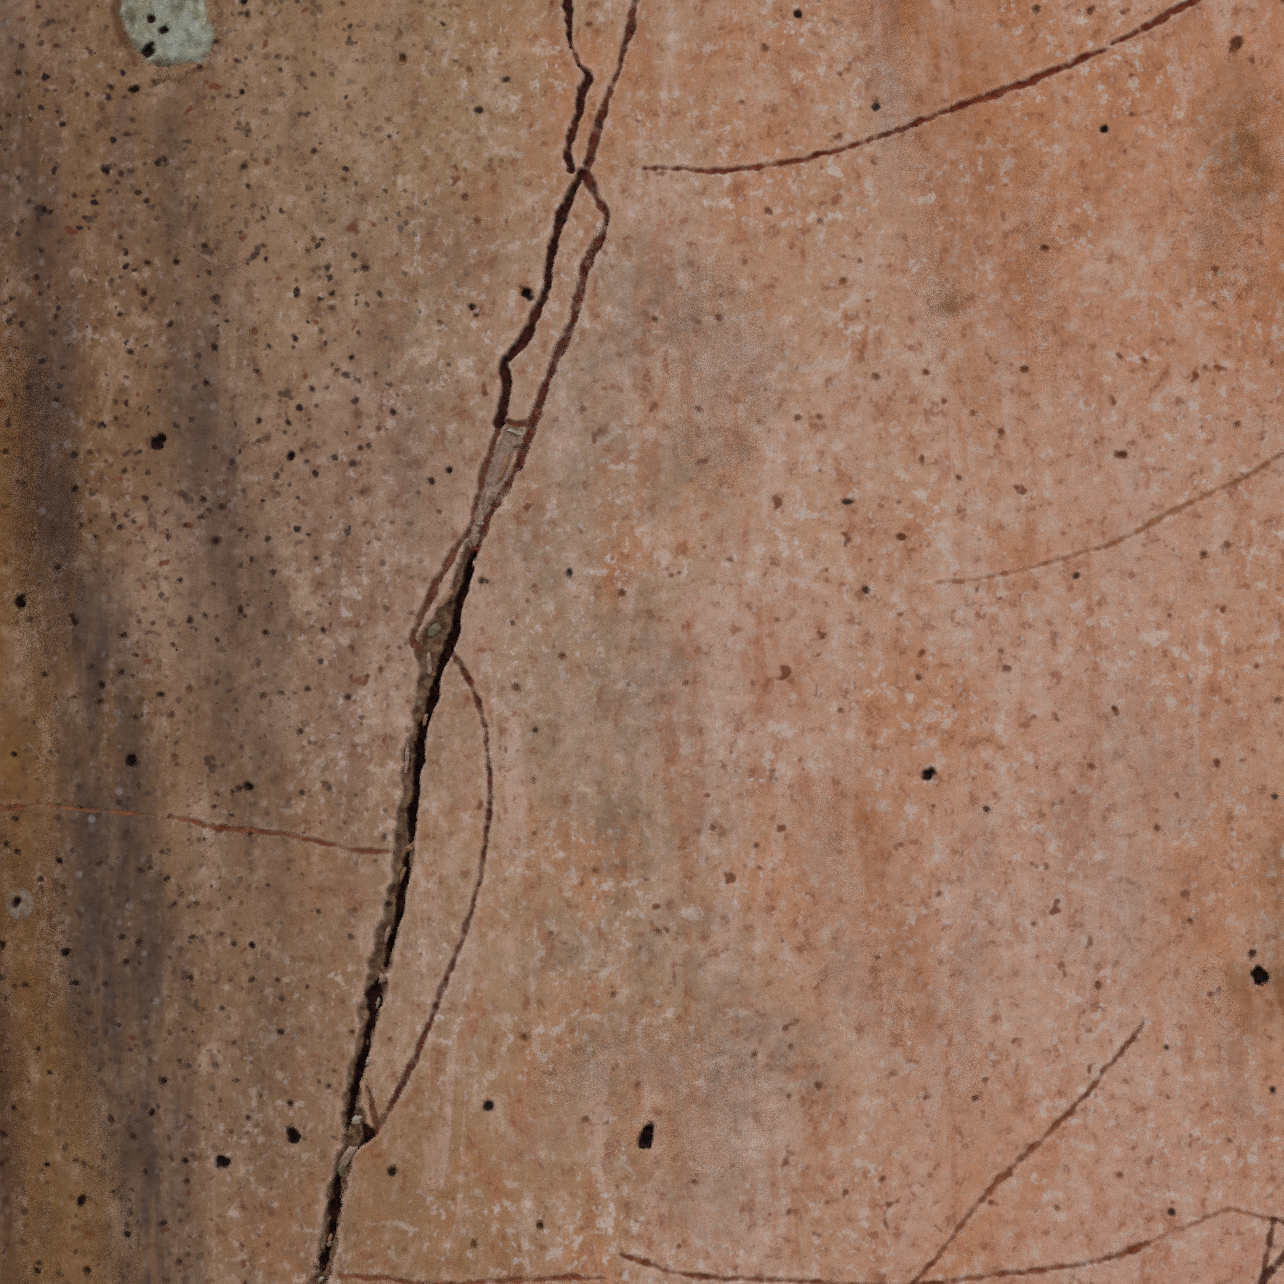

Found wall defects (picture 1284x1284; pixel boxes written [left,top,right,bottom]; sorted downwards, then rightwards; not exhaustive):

crack [643,0,1200,174]
crack [168,0,636,1284]
crack [0,804,137,815]
water stain [71,762,139,1034]
crack [910,1022,1151,1284]
crack [622,1255,856,1284]
crack [1181,1208,1284,1284]